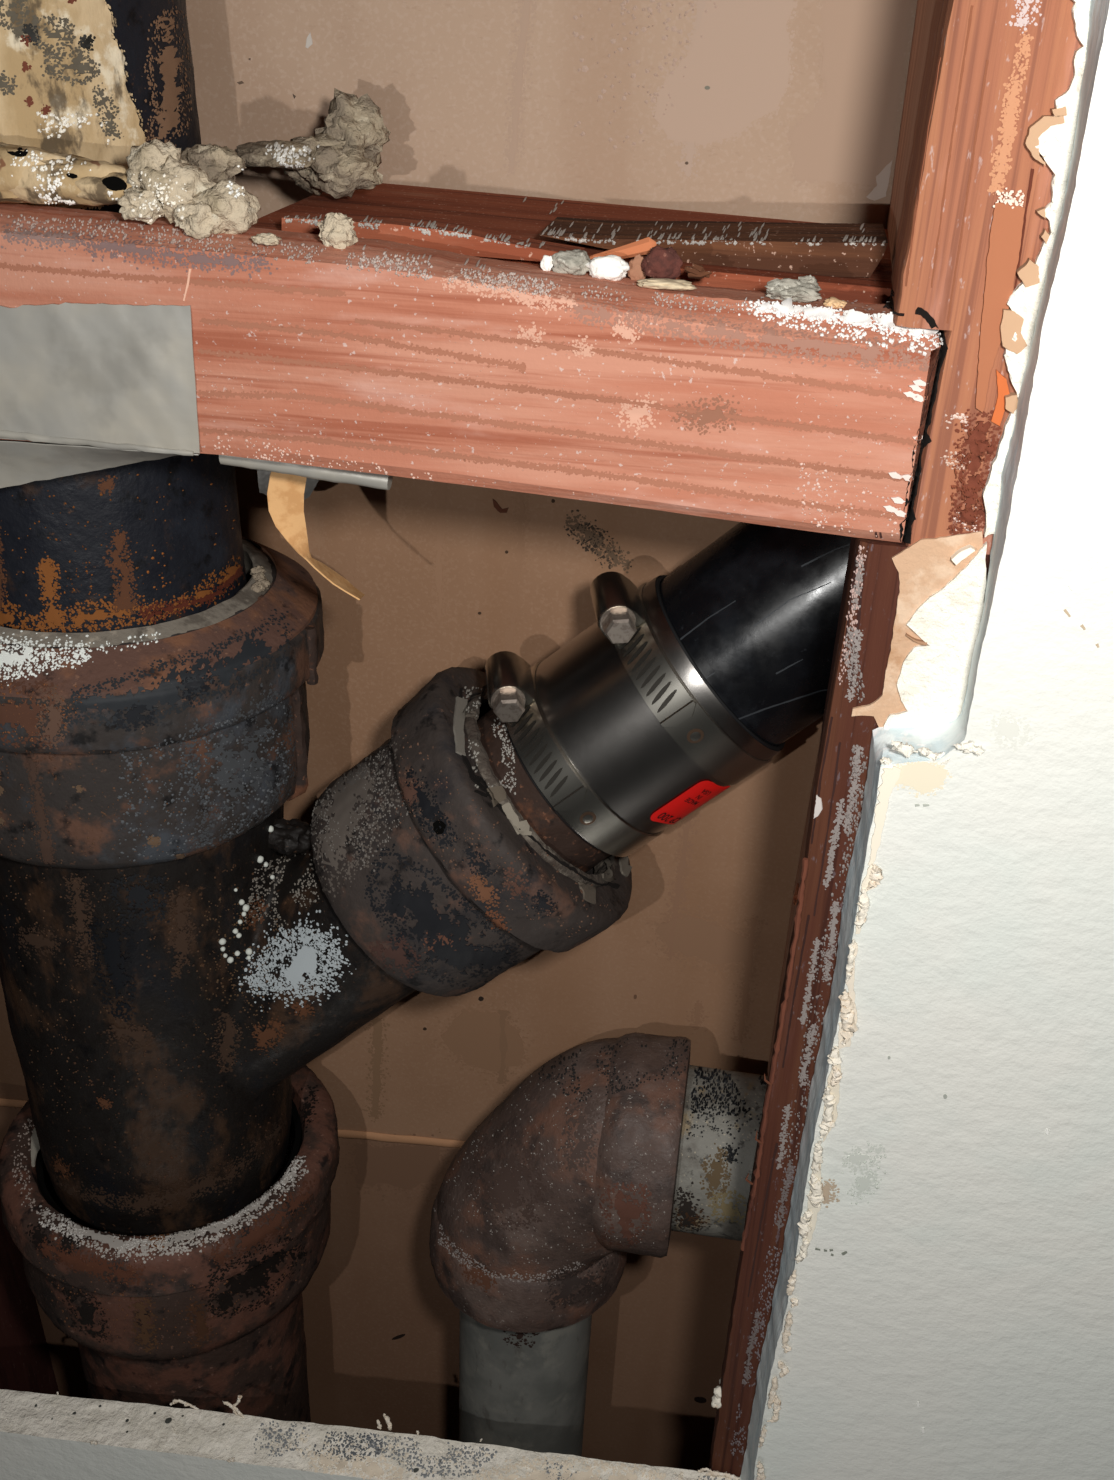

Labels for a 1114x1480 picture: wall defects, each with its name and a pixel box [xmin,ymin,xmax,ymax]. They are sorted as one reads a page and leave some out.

peeling [904,379,926,402]
peeling [883,471,913,517]
peeling [814,795,823,818]
peeling [823,765,901,1142]